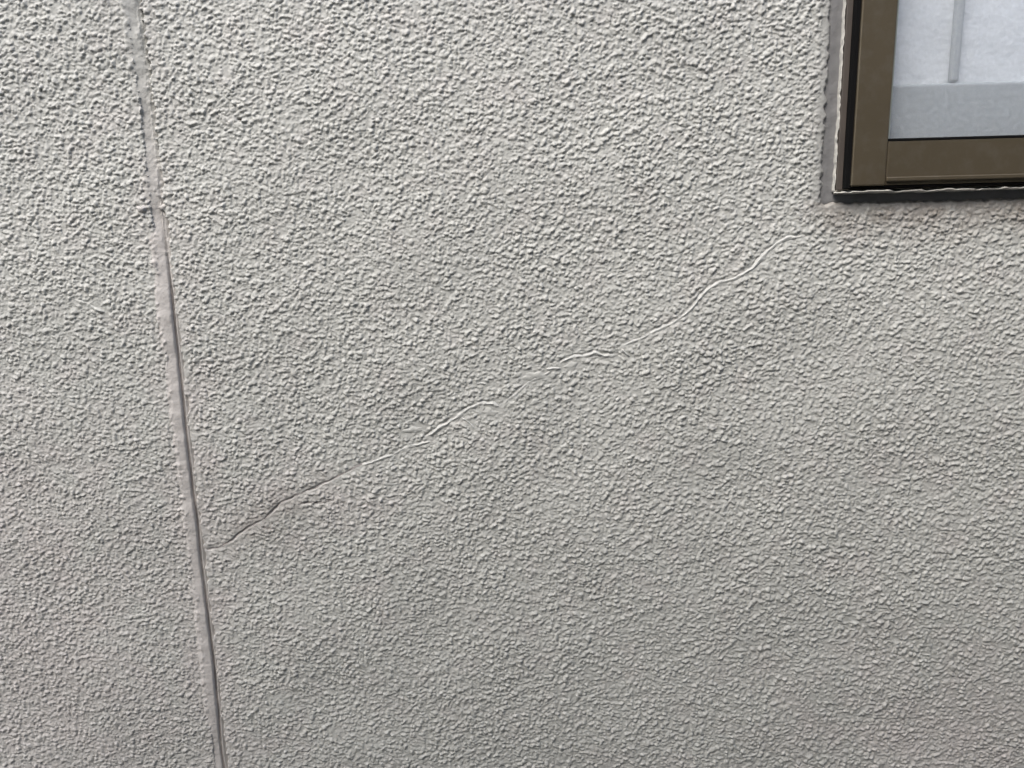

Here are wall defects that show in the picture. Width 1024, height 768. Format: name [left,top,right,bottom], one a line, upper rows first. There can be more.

crack [161,203,801,768]